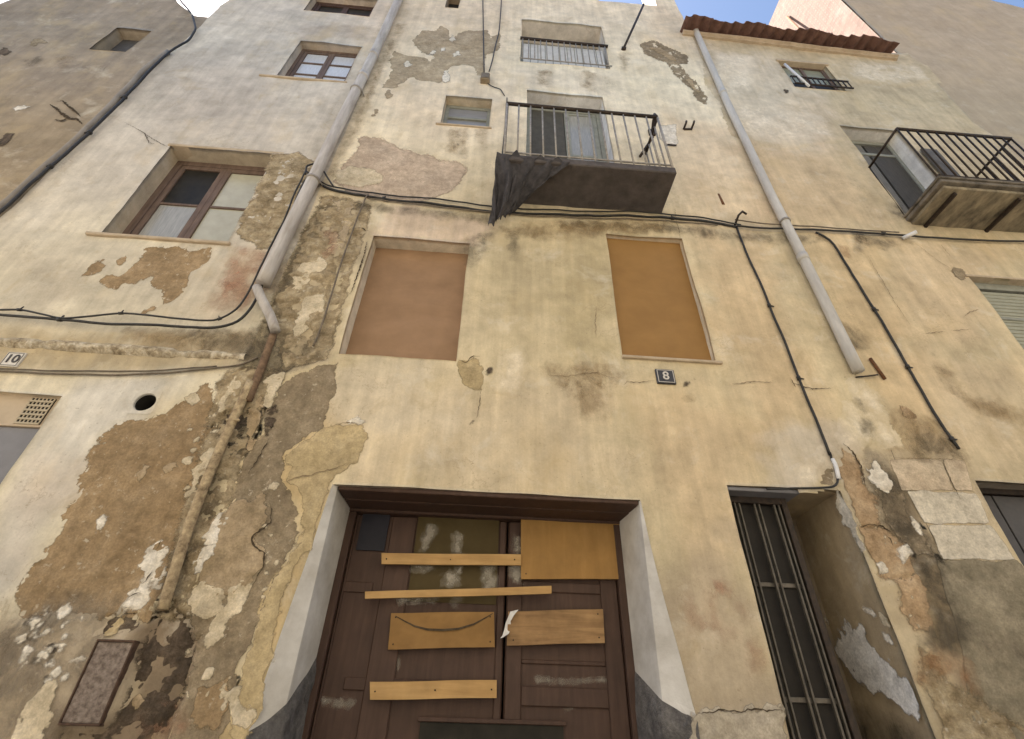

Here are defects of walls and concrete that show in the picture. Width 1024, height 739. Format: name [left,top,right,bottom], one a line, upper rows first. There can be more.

peeling [383,26,501,99]
spalling [640,40,708,105]
crack [50,100,82,124]
peeling [457,355,493,422]
peeling [15,136,467,739]
peeling [788,443,933,631]
peeling [824,607,920,722]